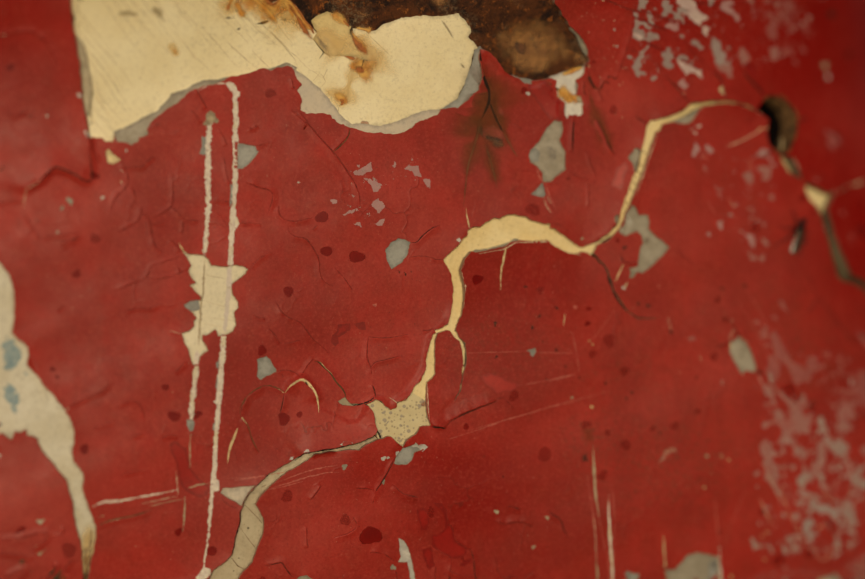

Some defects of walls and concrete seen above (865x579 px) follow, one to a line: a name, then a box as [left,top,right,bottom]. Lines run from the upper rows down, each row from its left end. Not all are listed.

peeling [179,244,248,366]
peeling [70,0,486,171]
crack [409,225,444,264]
rust [291,0,587,80]
crack [463,49,522,207]
crack [550,223,569,235]
peeling [338,0,812,465]
crack [616,255,638,287]
crack [723,111,865,291]
peeling [0,264,96,579]
peeling [729,300,865,558]
spalling [666,552,732,579]